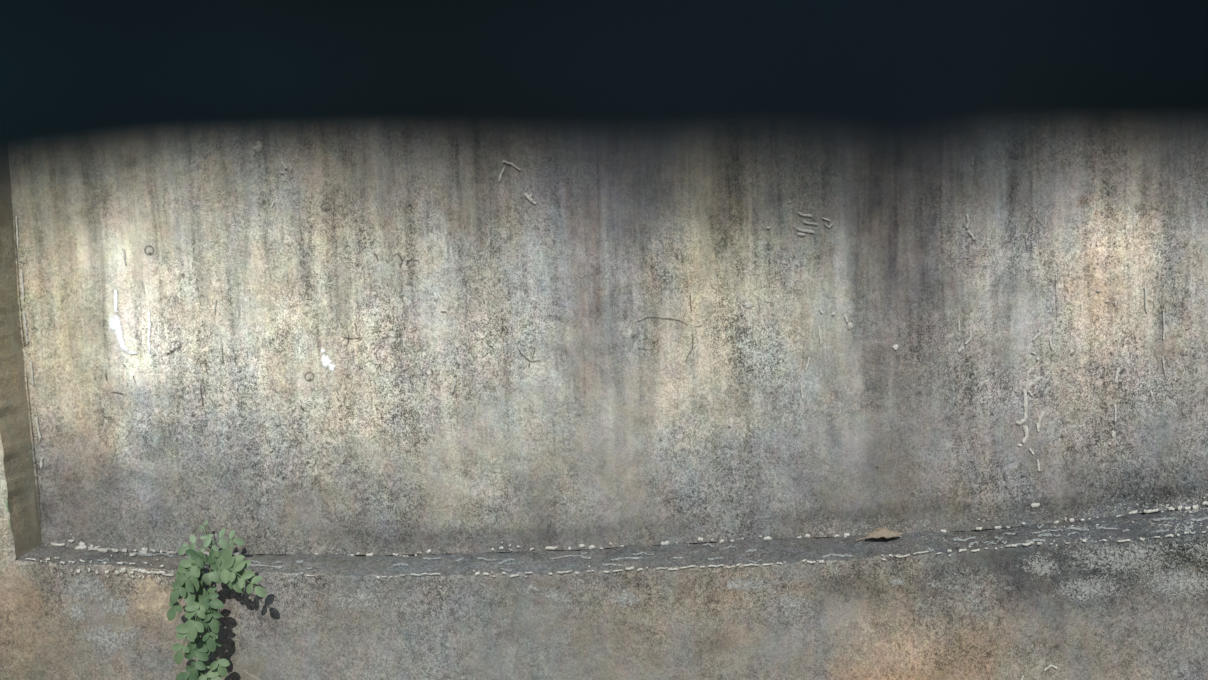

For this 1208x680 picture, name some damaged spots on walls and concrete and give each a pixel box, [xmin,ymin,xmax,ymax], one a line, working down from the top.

efflorescence [109,289,151,355]
leakage [321,348,336,371]